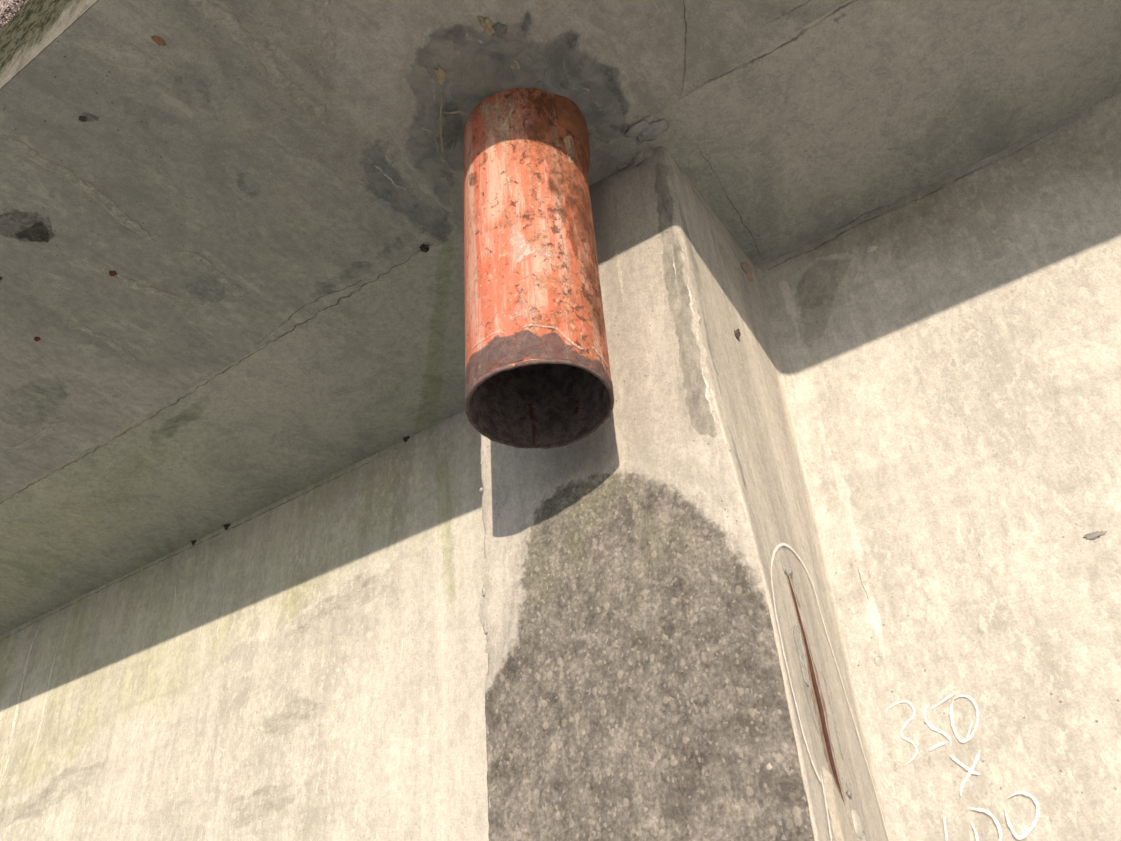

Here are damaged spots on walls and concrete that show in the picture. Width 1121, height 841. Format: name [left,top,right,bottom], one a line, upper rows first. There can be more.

spalling [0,205,60,248]
crack [283,285,353,336]
crack [780,556,867,841]